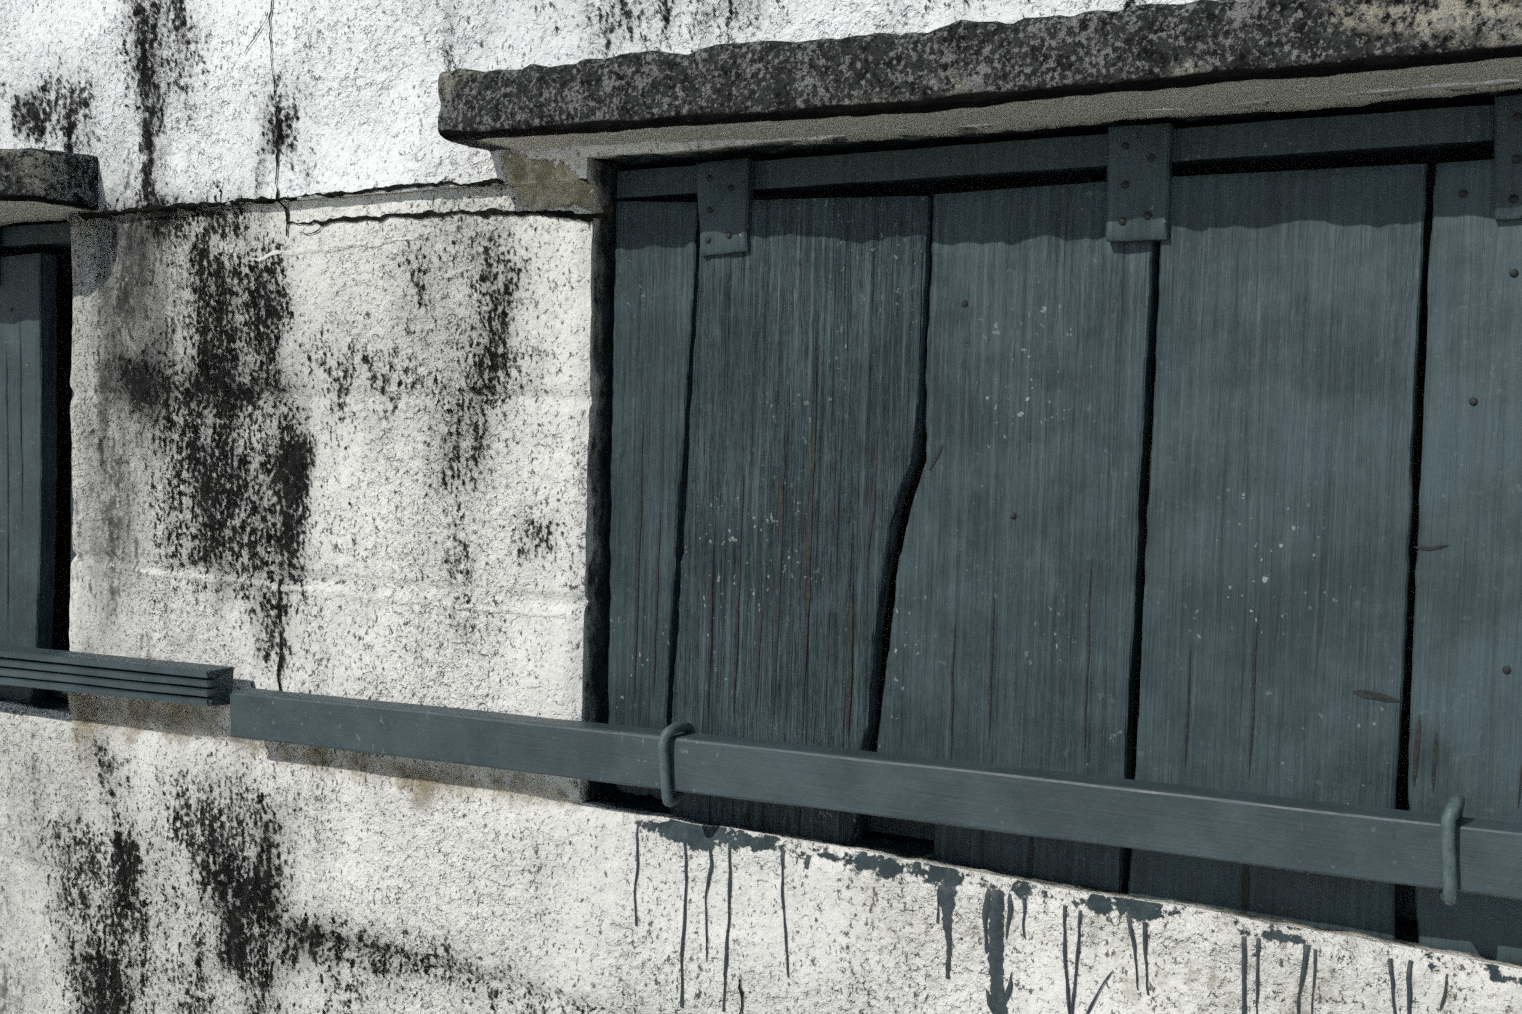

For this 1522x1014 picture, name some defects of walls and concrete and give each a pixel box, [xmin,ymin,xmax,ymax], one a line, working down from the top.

crack [78,0,608,236]
water stain [534,0,806,58]
water stain [0,0,560,679]
water stain [510,502,573,579]
water stain [0,723,644,1014]